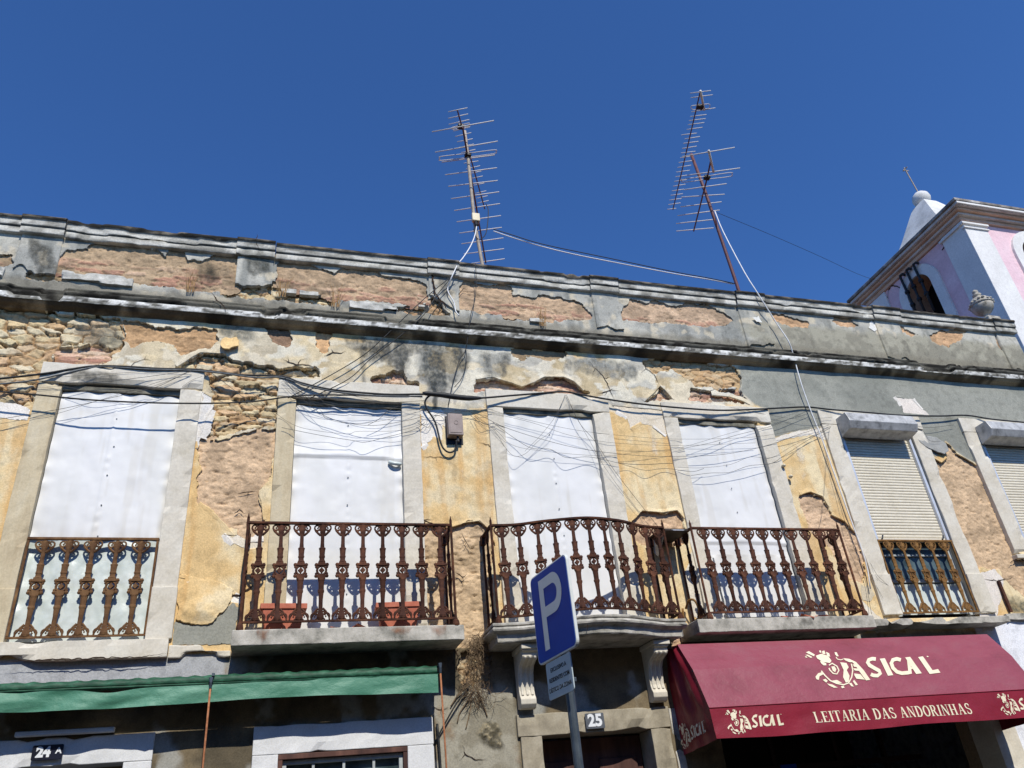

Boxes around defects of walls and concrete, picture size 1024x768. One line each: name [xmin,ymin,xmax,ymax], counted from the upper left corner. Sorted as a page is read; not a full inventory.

spalling [0,309,319,555]
spalling [26,244,592,323]
damp [357,337,468,408]
peeling [420,405,447,450]
spalling [621,300,733,328]
spalling [612,360,751,437]
spalling [753,314,809,328]
peeling [776,427,826,442]
spalling [929,330,966,347]
spalling [918,435,1024,632]
spalling [424,517,495,691]